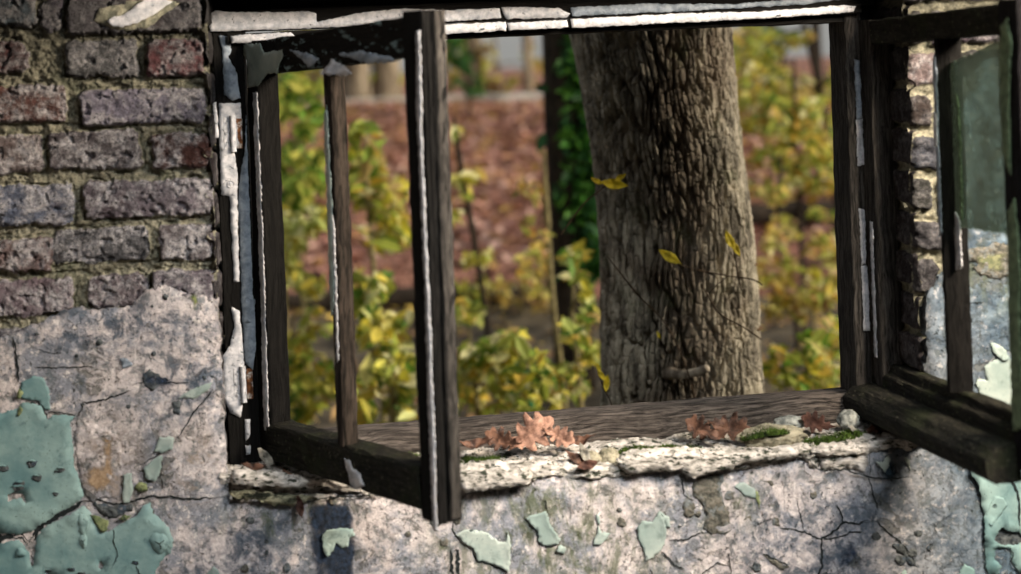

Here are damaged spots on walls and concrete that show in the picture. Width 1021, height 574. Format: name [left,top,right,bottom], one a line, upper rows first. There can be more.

flaking render [108,0,172,27]
flaking render [142,369,171,391]
peeling [0,376,175,574]
crack [0,337,220,566]
peeling [527,511,566,554]
peeling [593,508,670,562]
crack [650,532,732,574]
flaking render [682,474,760,535]
flaking render [751,555,789,572]
crack [741,454,917,574]
flaking render [892,543,932,574]
peeling [959,472,1021,574]